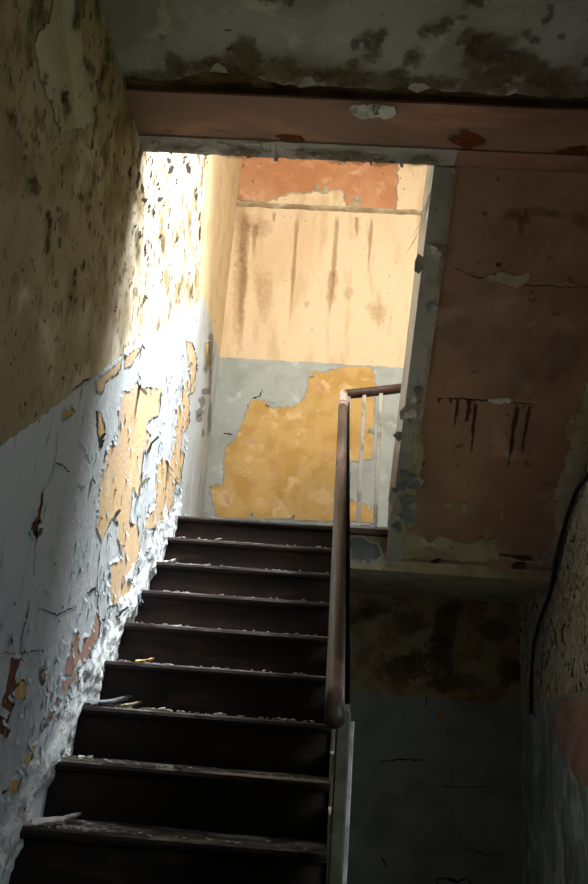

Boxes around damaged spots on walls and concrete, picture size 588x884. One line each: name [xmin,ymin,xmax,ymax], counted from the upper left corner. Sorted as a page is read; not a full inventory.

peeling [33,0,95,133]
water stain [84,15,588,103]
flaking render [349,103,396,120]
water stain [129,155,165,224]
crack [43,432,100,489]
peeling [208,365,377,523]
corrosion [437,398,477,450]
corrosion [509,406,531,460]
crack [1,543,106,659]
flaking render [0,339,211,884]
peeling [553,691,588,791]